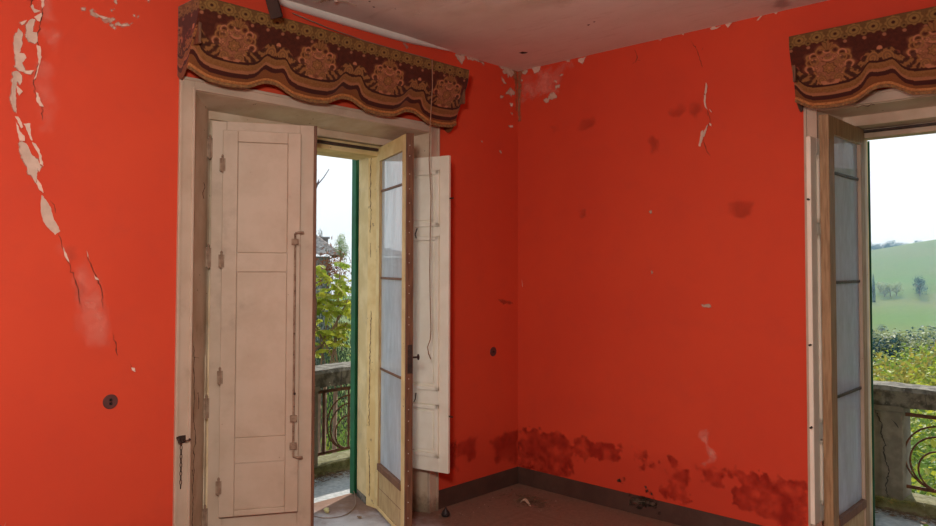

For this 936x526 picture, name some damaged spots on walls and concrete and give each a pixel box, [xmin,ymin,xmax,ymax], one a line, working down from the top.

spalling [81,0,139,29]
peeling [499,66,563,114]
crack [10,0,103,304]
crack [875,410,899,498]